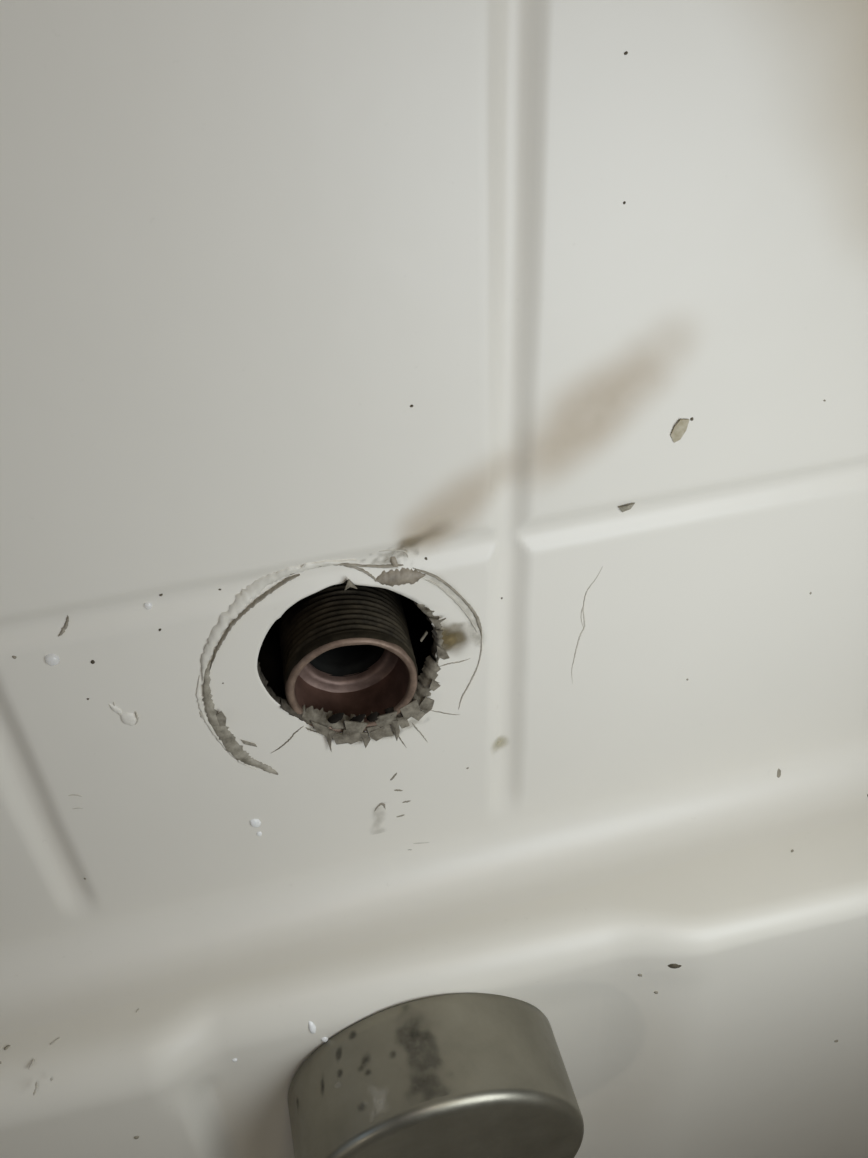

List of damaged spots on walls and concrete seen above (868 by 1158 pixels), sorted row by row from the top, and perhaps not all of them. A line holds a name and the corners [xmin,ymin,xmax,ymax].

spalling [280,601,450,750]
crack [272,726,332,753]
crack [399,710,459,747]